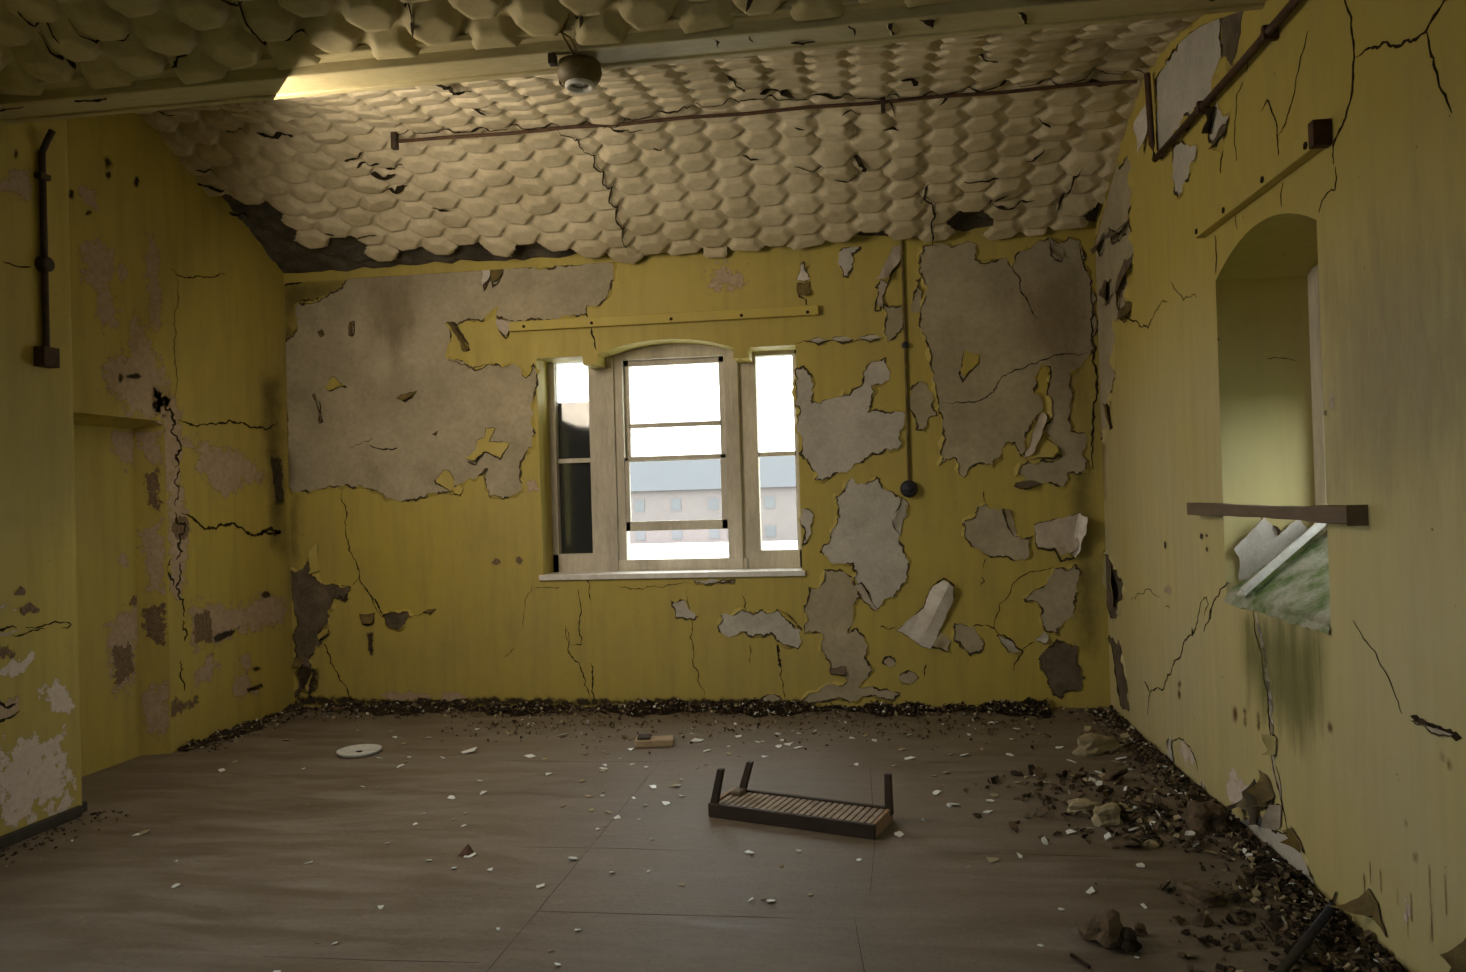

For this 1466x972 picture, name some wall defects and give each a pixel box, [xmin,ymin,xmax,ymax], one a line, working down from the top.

crack [0,12,130,112]
crack [226,128,293,139]
crack [344,0,1144,255]
crack [1234,31,1308,207]
crack [1318,0,1452,213]
peeling [285,262,617,502]
peeling [0,646,36,678]
spalling [0,586,40,616]
crack [181,511,281,537]
spalling [97,310,436,742]
crack [1131,582,1228,715]
peeling [0,677,77,830]